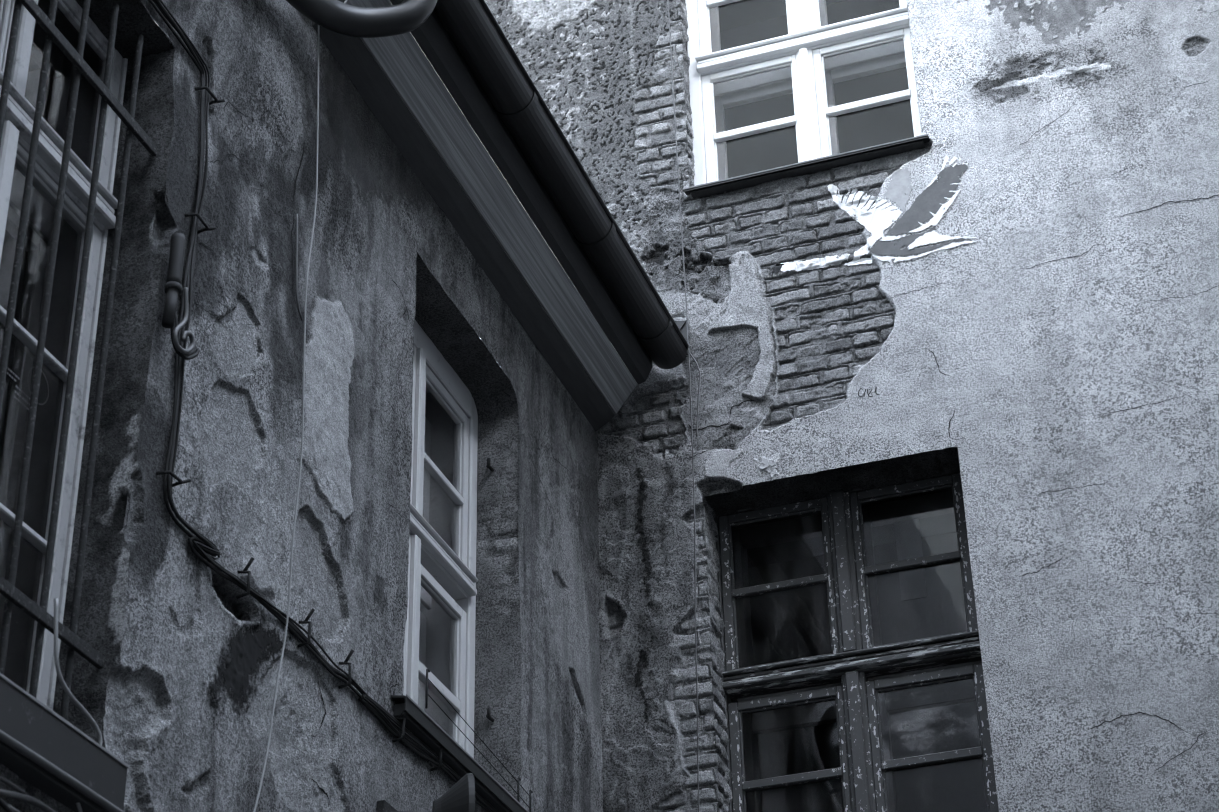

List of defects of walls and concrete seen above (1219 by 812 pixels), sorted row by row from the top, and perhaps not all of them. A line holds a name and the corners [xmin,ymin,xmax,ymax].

peeling [952,0,1219,110]
crack [1021,244,1102,269]
crack [1113,195,1218,218]
flaking render [198,291,268,496]
flaking render [485,0,937,812]
flaking render [122,462,147,561]
peeling [288,294,355,645]
flaking render [167,563,261,642]
flaking render [103,659,173,812]
flaking render [181,766,213,798]
flaking render [244,647,352,812]
crack [1083,712,1210,770]